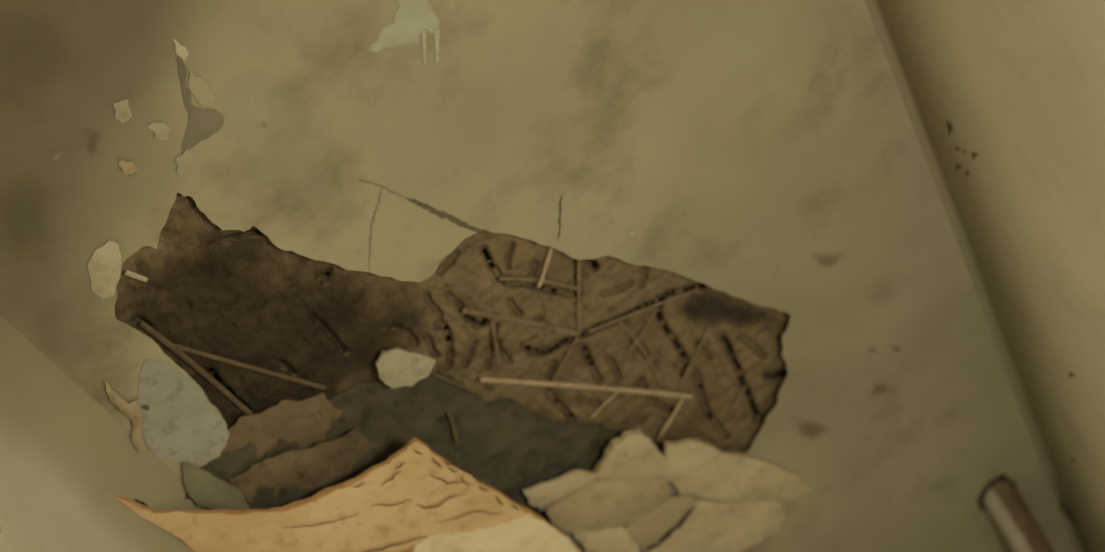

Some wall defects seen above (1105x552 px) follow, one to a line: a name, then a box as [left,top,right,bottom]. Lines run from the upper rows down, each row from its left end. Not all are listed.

peeling [113,99,132,125]
peeling [172,36,224,177]
crack [411,199,485,233]
flaking render [87,193,810,552]